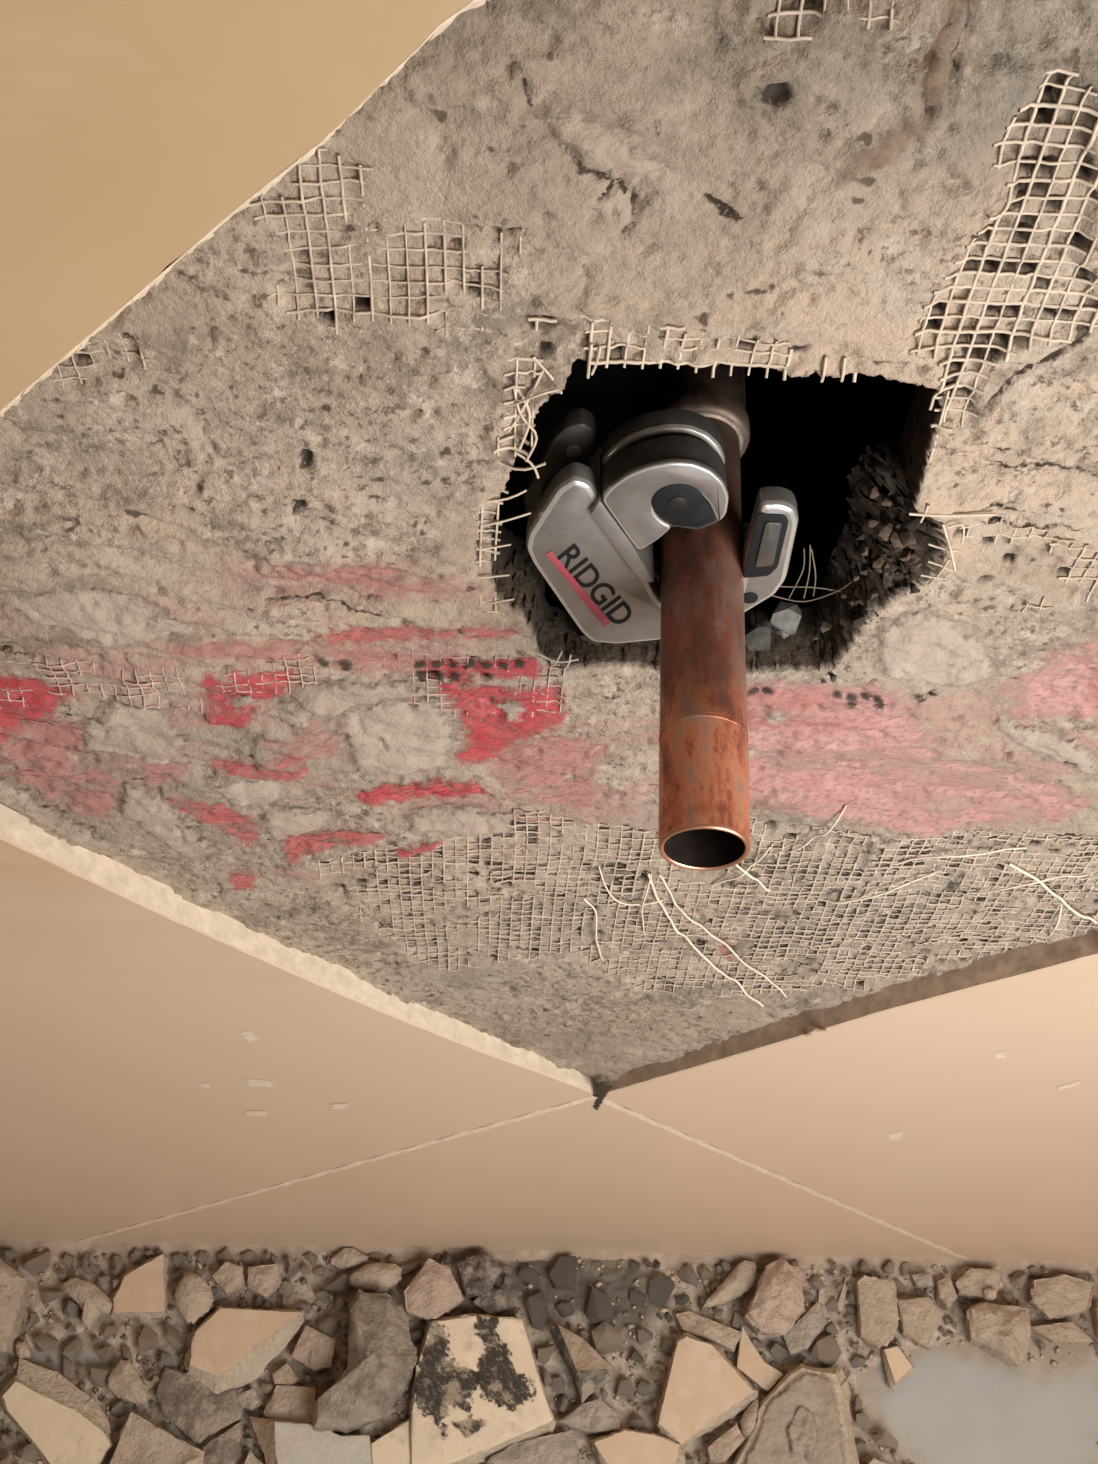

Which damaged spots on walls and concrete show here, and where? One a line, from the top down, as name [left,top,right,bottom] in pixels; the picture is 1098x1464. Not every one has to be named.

spalling [0,0,489,417]
crack [985,331,1090,409]
spalling [798,486,922,652]